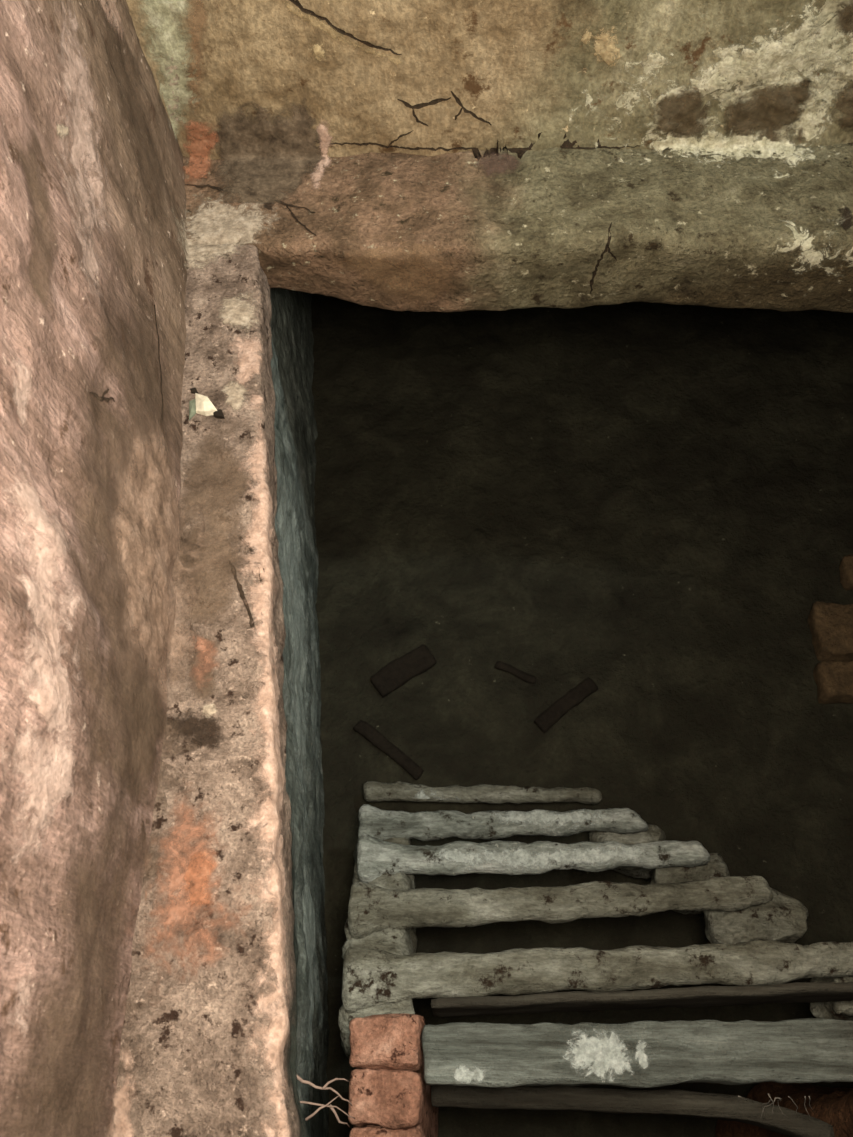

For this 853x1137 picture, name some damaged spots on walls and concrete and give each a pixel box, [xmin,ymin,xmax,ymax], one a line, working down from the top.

crack [286,0,402,64]
water stain [569,0,853,165]
crack [316,91,639,160]
water stain [772,218,853,276]